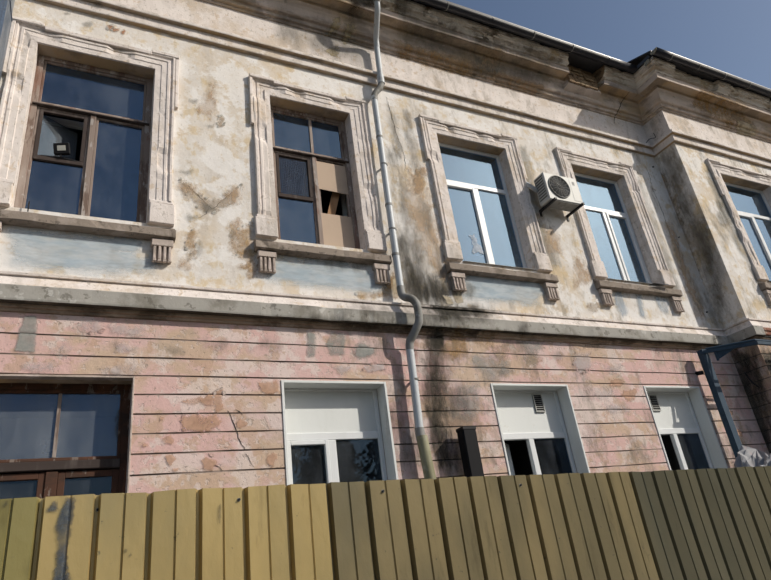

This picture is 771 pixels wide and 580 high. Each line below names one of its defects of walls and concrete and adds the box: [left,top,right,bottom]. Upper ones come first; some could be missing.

peeling [196,184,243,214]
water stain [400,167,479,320]
water stain [667,219,704,316]
peeling [181,387,226,433]
water stain [426,331,466,467]
water stain [737,352,771,454]